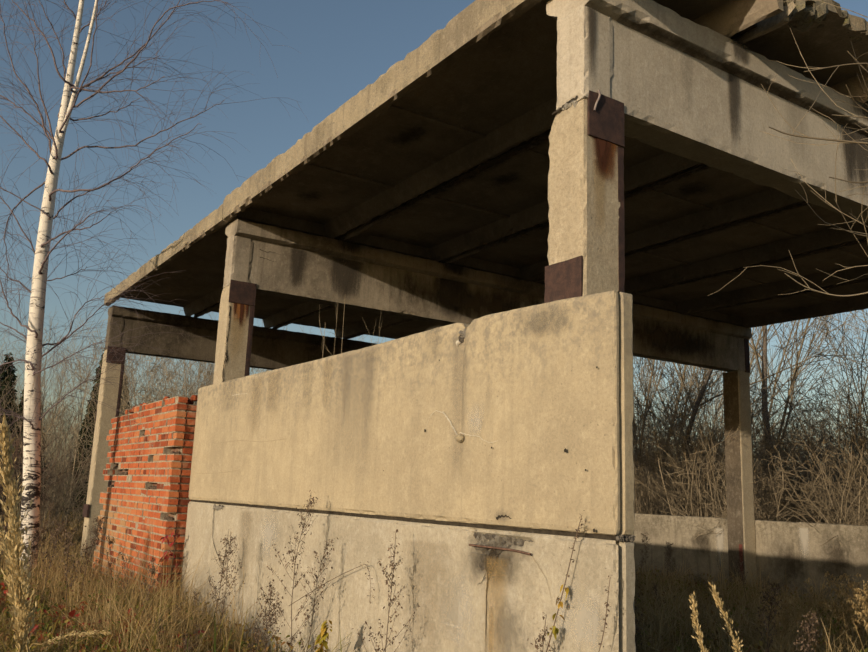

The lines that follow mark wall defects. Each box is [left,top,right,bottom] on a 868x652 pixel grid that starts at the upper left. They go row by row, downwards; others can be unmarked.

spalling [783,0,829,32]
damp [733,40,749,62]
damp [729,73,739,133]
corrosion [595,137,616,176]
damp [843,126,868,187]
damp [290,249,306,282]
damp [332,240,363,294]
spalling [468,530,533,578]
damp [786,528,808,576]